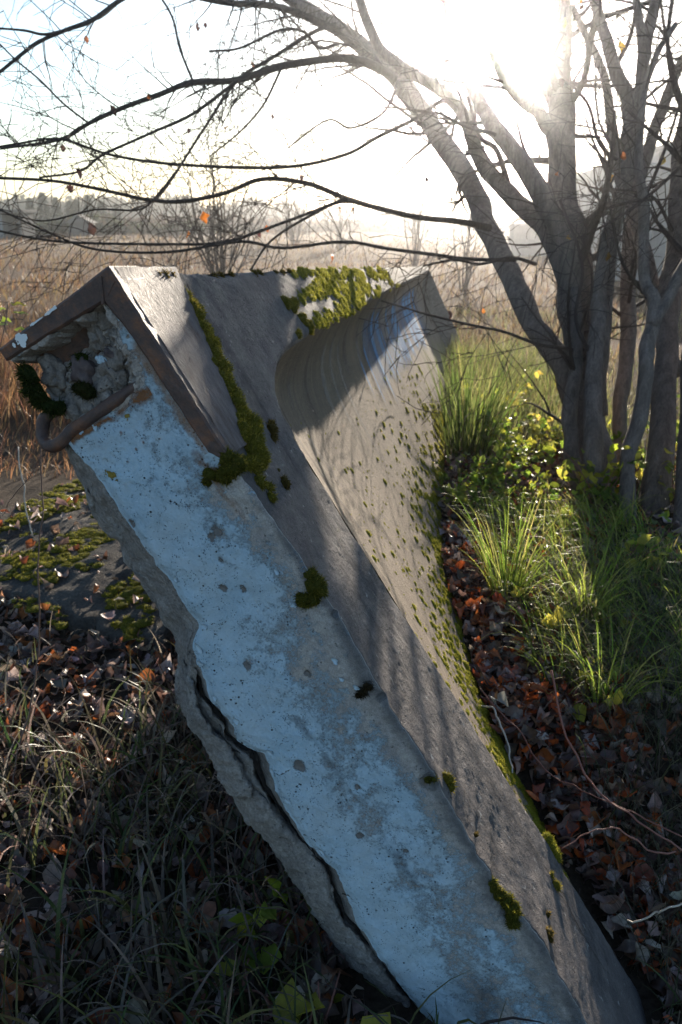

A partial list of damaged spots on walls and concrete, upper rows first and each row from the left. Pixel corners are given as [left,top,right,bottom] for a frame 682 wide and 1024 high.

corrosion [71,388,152,444]
peeling [11,288,565,1024]
crack [197,673,374,952]